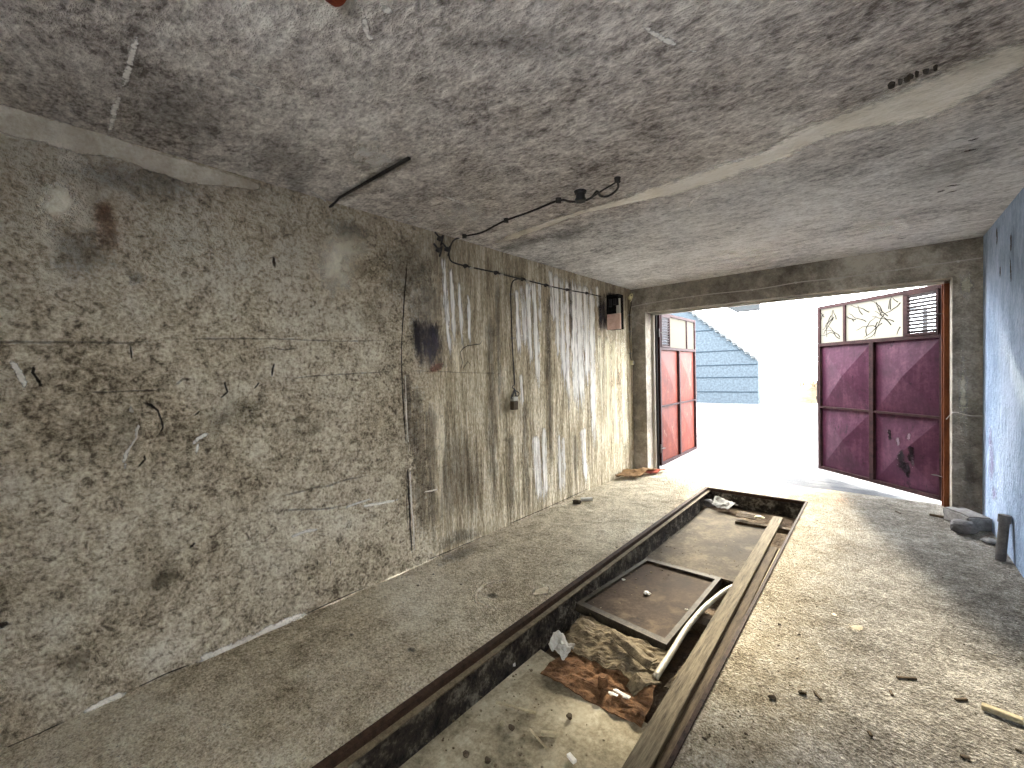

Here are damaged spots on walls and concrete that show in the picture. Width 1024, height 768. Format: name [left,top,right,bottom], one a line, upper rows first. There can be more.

water stain [441,259,471,354]
crack [203,338,324,389]
crack [300,265,482,559]
water stain [488,272,628,507]
crack [510,488,589,524]
crack [302,588,363,616]
crack [139,664,190,687]
crack [8,722,63,747]